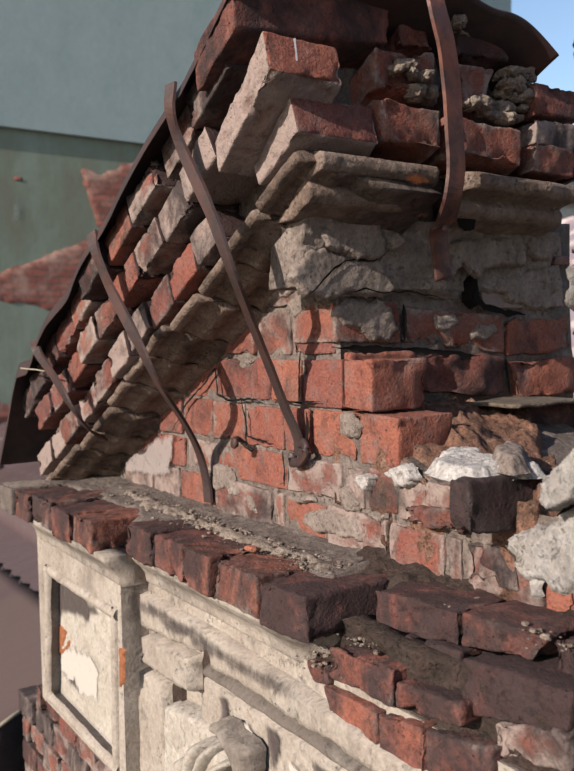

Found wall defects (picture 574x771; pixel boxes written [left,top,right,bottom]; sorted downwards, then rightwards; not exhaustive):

crack [309,250,389,294]
spalling [462,276,480,309]
crack [333,287,481,360]
peeling [433,313,459,331]
crack [503,355,511,394]
crack [173,351,321,486]
flaking render [339,411,363,439]
flaking render [288,463,422,542]
crack [556,504,574,516]
spalling [307,508,574,771]
peeling [58,624,98,700]